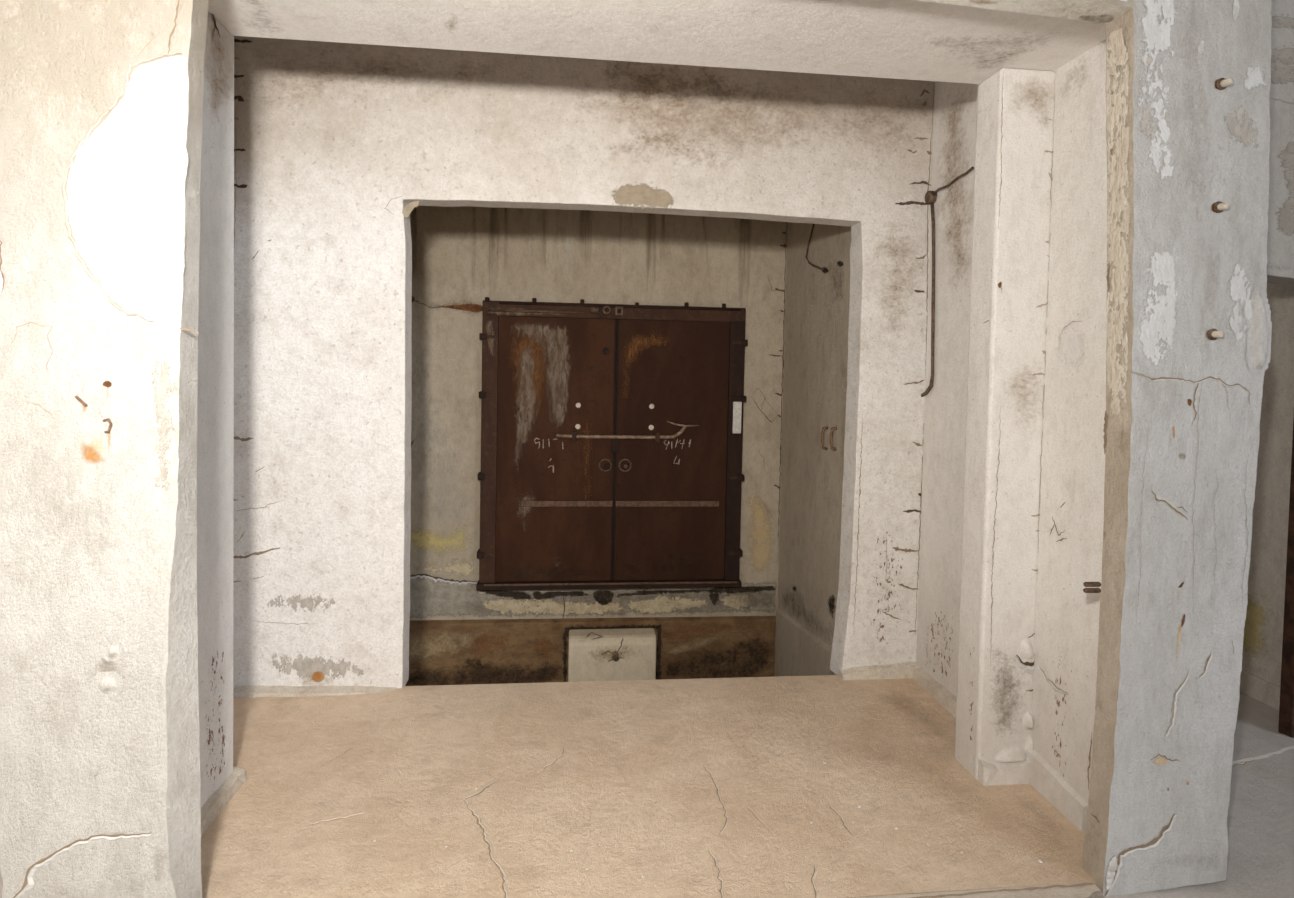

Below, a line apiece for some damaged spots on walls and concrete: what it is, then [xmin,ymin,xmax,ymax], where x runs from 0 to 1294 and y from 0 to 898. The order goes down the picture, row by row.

peeling [1244,48,1294,90]
flaking render [61,52,189,323]
peeling [1081,0,1180,454]
peeling [1276,142,1294,236]
peeling [1229,263,1253,342]
crack [1130,372,1250,623]
crack [1166,639,1234,737]
crack [13,833,152,898]
crack [463,780,509,898]
crack [703,765,774,898]
crack [811,864,819,898]
crack [911,814,1177,898]